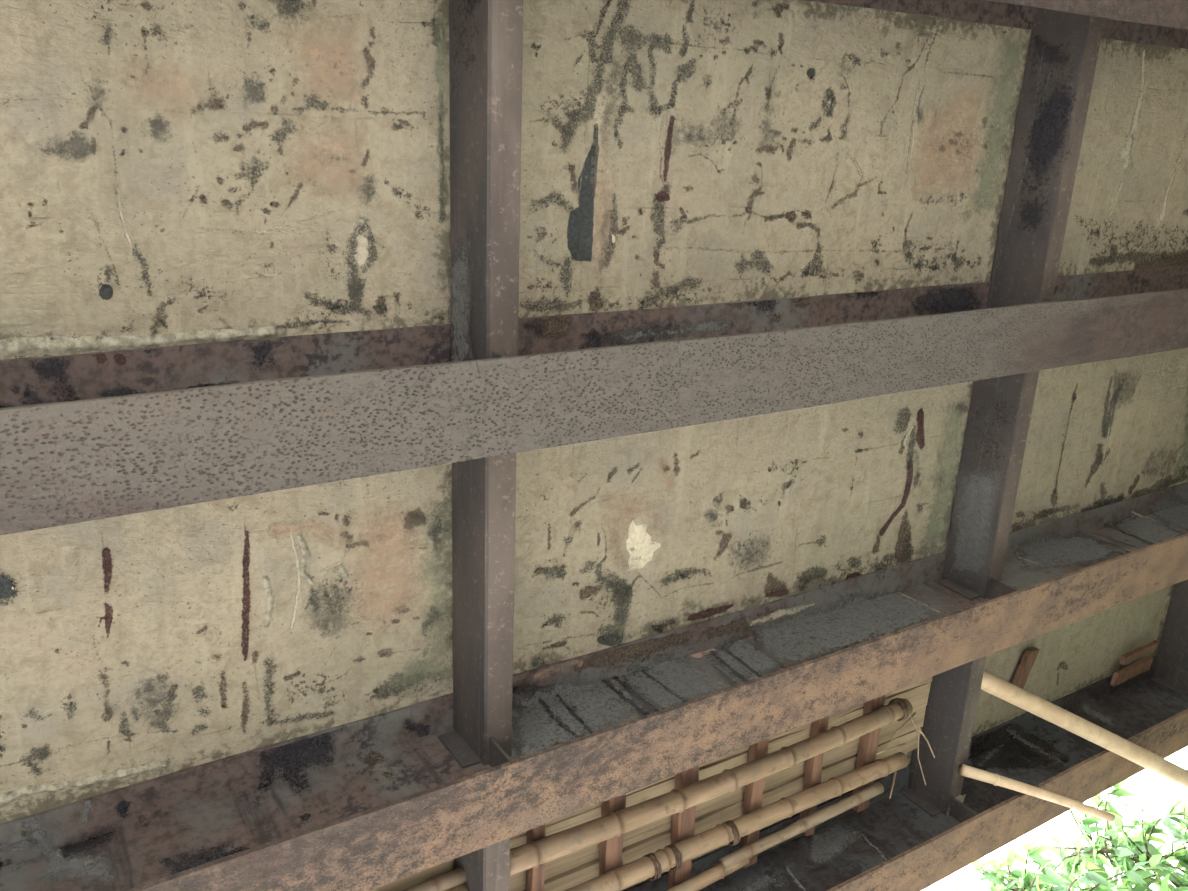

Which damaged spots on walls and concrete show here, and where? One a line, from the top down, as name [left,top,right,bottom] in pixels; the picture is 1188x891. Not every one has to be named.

mould [209,68,354,215]
mould [361,0,447,221]
mould [540,0,735,151]
rust [659,116,679,181]
leakage [99,266,118,300]
leakage [520,185,725,312]
leakage [733,250,864,287]
spalling [626,520,661,571]
rust [93,547,113,640]
rust [241,531,251,661]
rust [241,682,250,733]
leakage [252,651,347,726]